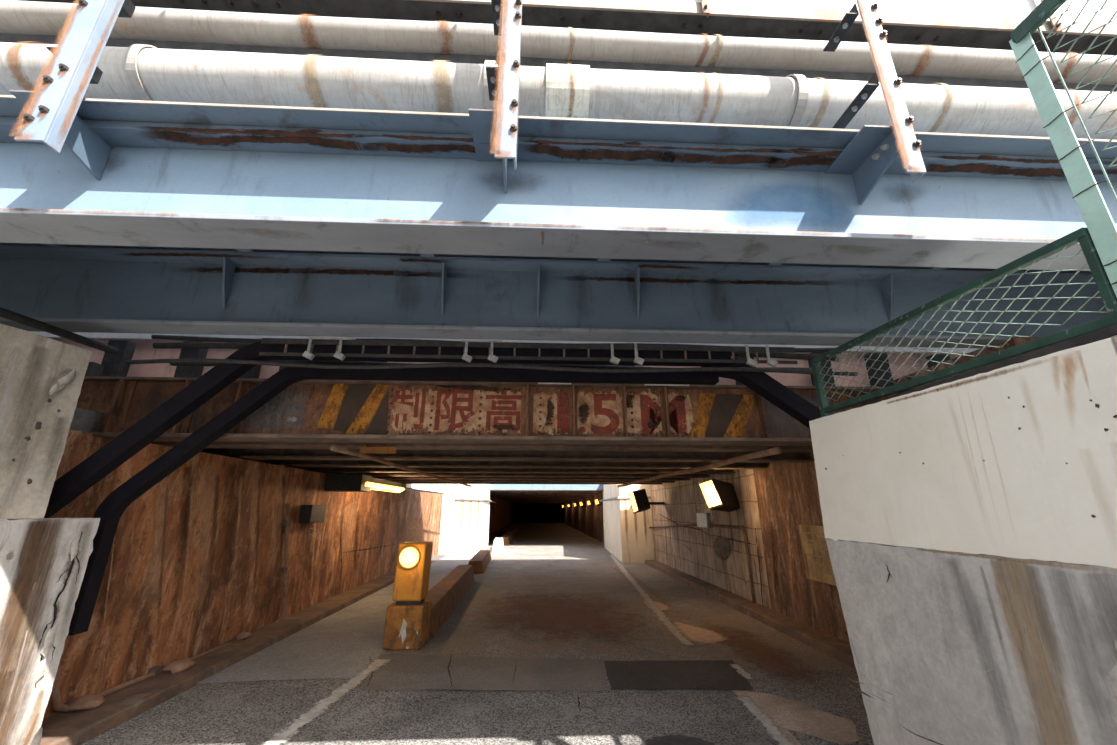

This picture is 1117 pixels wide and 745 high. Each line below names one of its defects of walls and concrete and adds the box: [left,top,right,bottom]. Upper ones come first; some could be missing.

corrosion [8,0,84,138]
corrosion [63,40,103,129]
corrosion [145,0,842,168]
corrosion [858,0,1065,178]
crack [35,532,82,688]